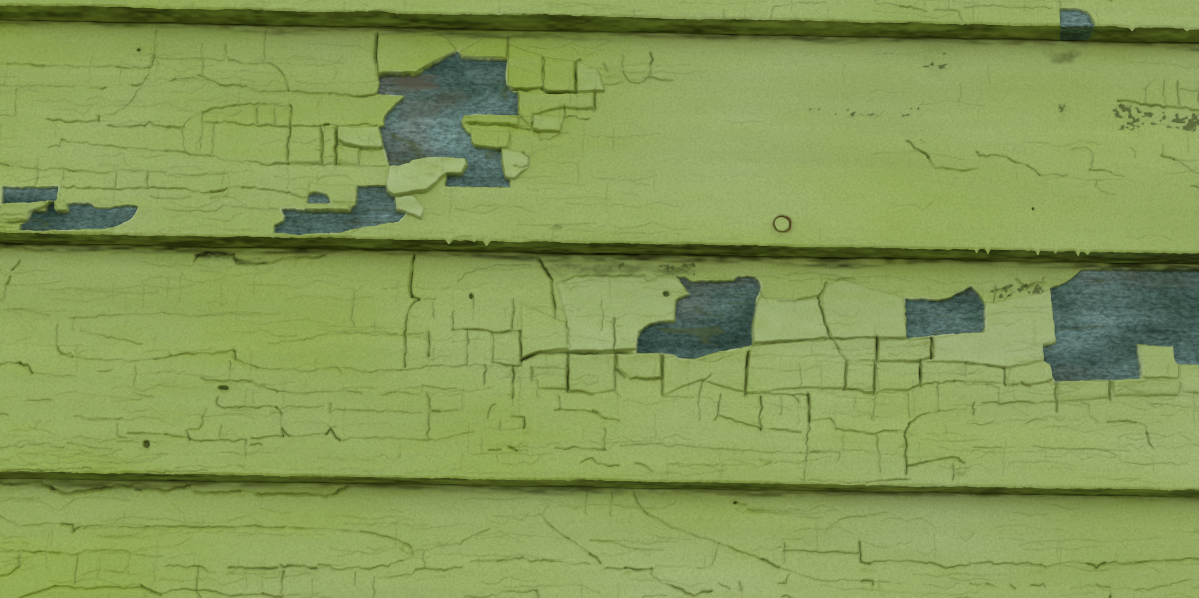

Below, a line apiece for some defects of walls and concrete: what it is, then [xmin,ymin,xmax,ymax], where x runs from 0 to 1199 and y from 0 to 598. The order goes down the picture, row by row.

crack [874,0,1062,25]
peeling [1059,8,1096,41]
crack [467,35,674,169]
crack [1116,79,1199,113]
peeling [273,31,605,235]
crack [905,139,1199,196]
peeling [0,186,138,231]
peeling [521,268,1199,401]
crack [0,219,1199,598]